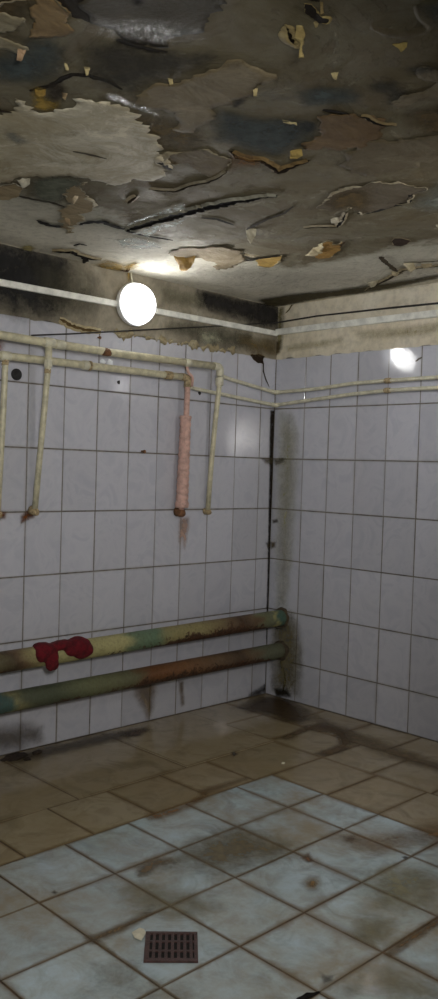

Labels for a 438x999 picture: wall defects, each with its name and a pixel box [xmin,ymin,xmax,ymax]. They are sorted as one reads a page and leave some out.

peeling [0,0,90,61]
peeling [278,0,332,58]
peeling [0,59,278,234]
peeling [301,114,386,151]
peeling [168,228,282,271]
peeling [305,241,345,259]
peeling [392,238,410,246]